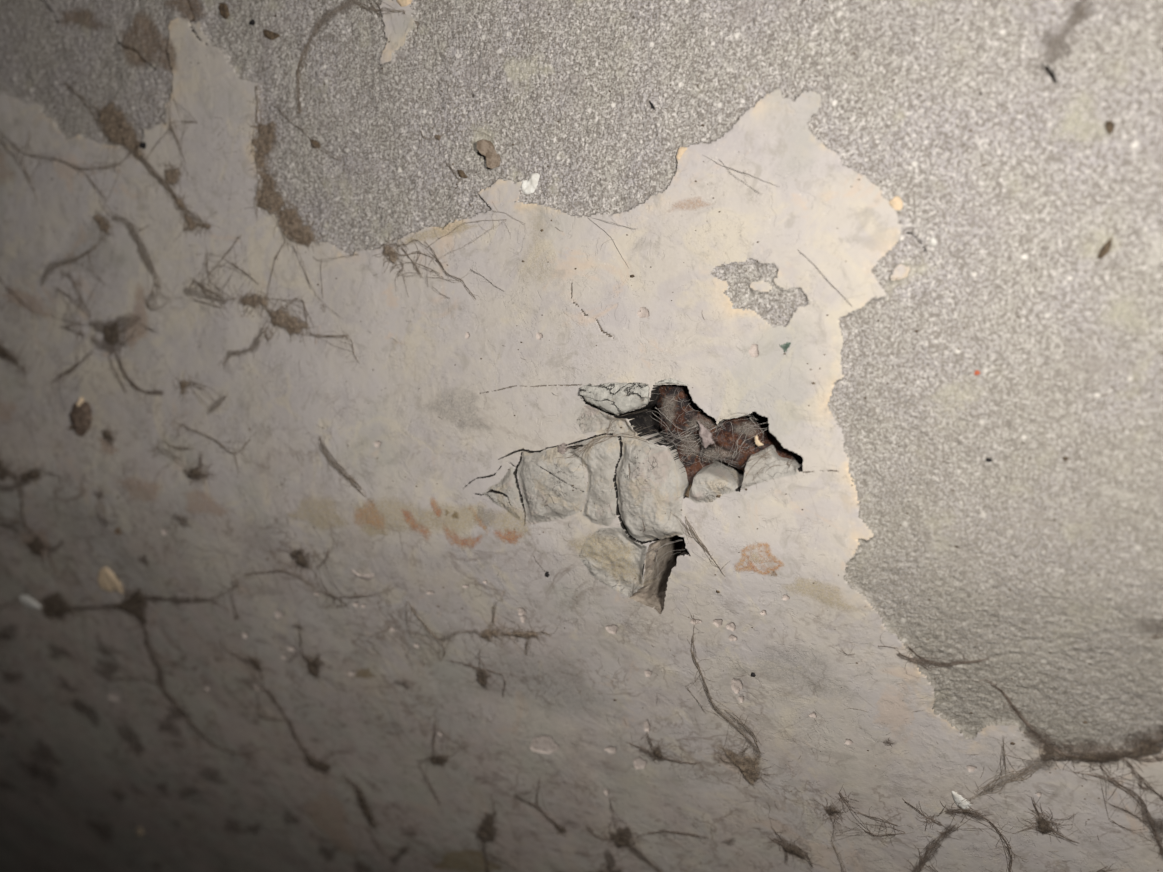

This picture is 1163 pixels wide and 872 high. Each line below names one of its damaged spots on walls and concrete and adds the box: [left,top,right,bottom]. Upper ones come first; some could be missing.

peeling [476,139,501,169]
spalling [521,173,540,195]
peeling [711,258,809,328]
spalling [577,378,803,503]
crack [465,433,659,579]
spalling [20,595,41,609]
spalling [97,567,124,594]
spalling [579,526,691,614]